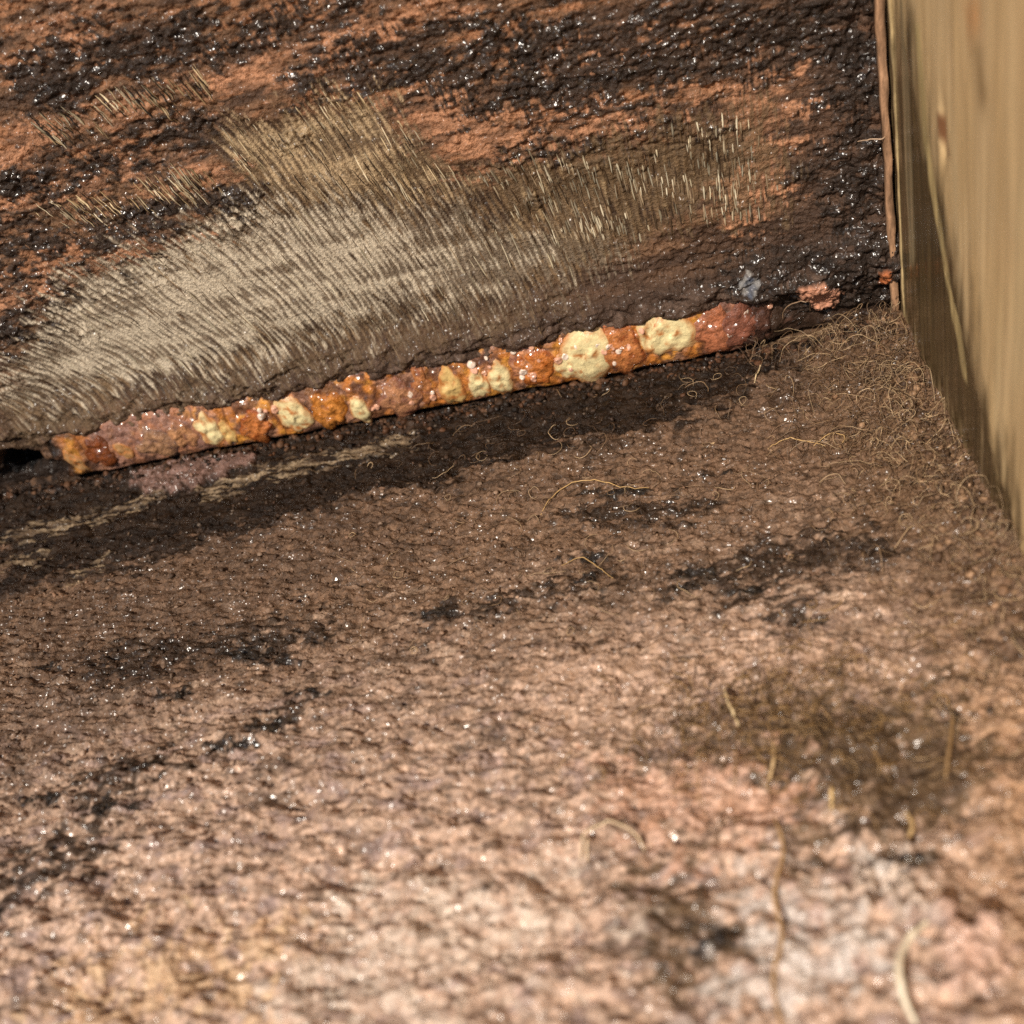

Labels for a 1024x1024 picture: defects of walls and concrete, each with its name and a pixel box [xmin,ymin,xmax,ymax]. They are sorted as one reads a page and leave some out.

peeling [0,63,810,452]
corrosion [47,279,884,477]
water stain [0,0,1024,554]
water stain [0,348,1024,1024]